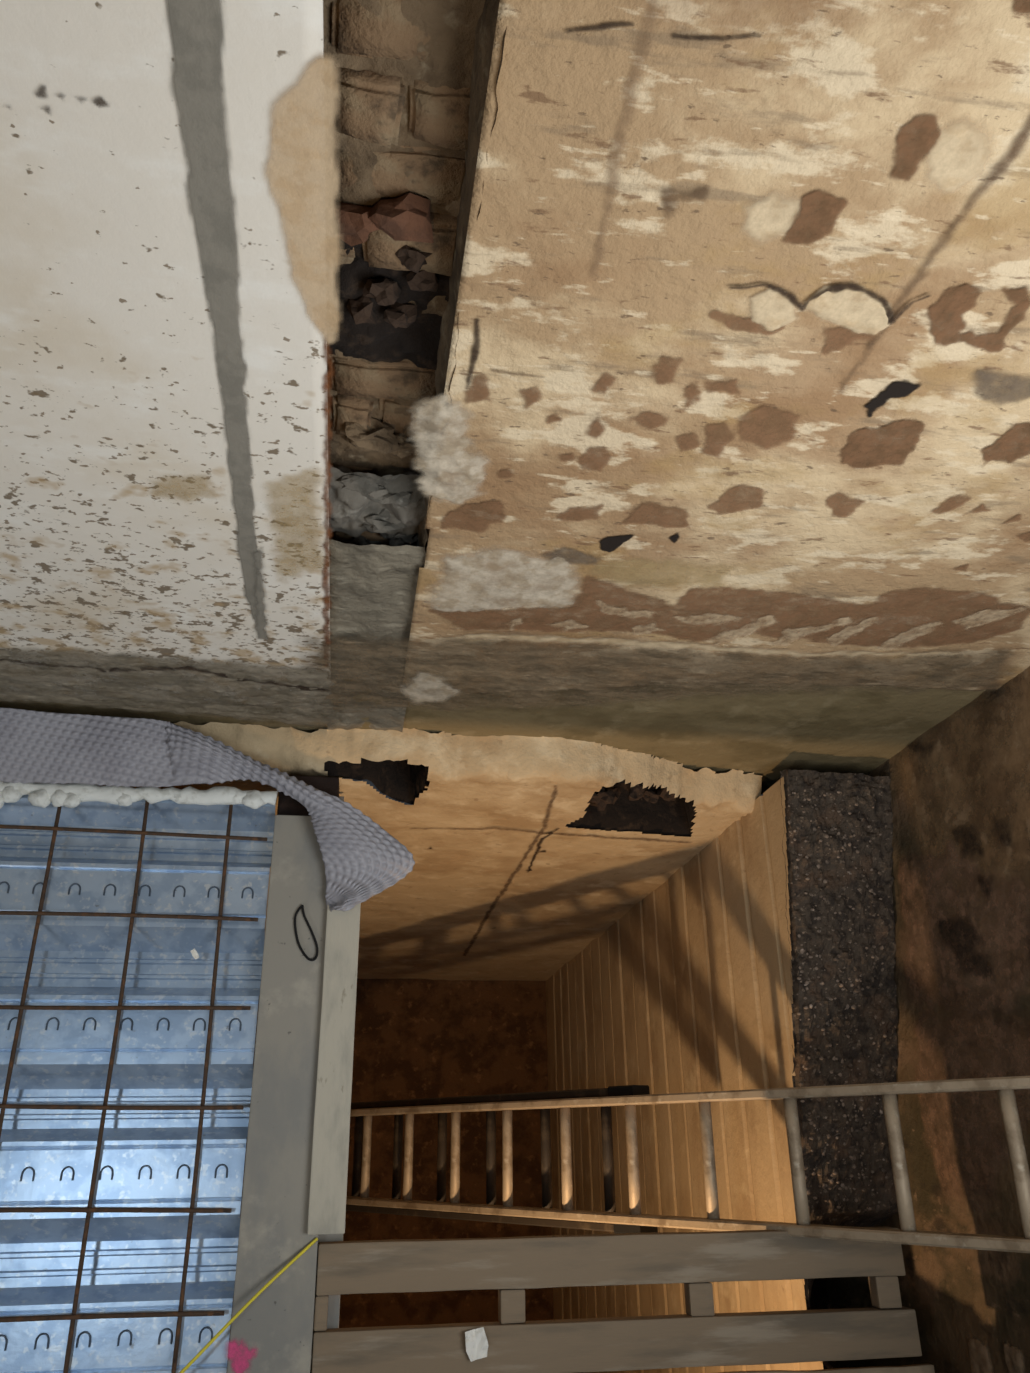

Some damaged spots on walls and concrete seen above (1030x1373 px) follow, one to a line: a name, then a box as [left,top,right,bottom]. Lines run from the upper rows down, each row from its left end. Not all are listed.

crack [926,122,1030,265]
flaking render [0,0,1030,882]
crack [463,788,688,956]